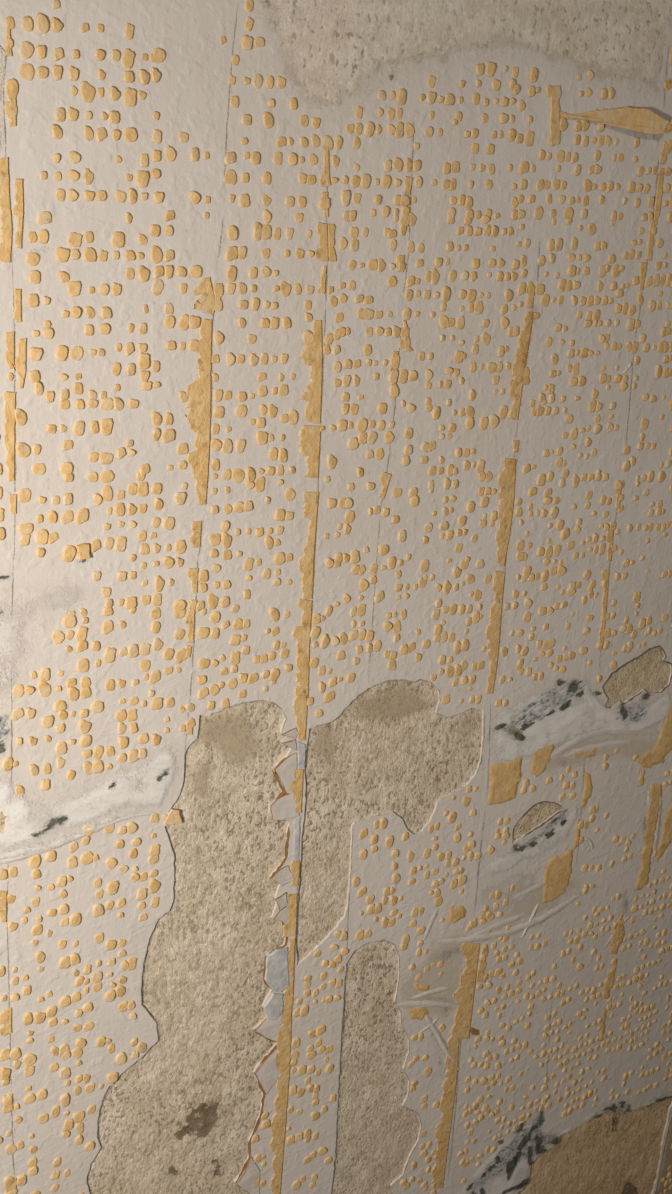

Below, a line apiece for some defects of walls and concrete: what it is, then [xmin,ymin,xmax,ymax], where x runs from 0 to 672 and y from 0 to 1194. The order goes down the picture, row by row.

peeling [549,85,672,145]
water stain [184,277,223,547]
water stain [508,286,535,420]
water stain [485,440,519,694]
water stain [0,704,286,861]
flaking render [512,801,562,842]
water stain [490,675,672,763]
flaking render [602,645,672,891]
flaking render [87,679,554,1194]
water stain [171,1100,219,1144]
water stain [422,942,672,1194]
flaking render [517,1096,672,1194]